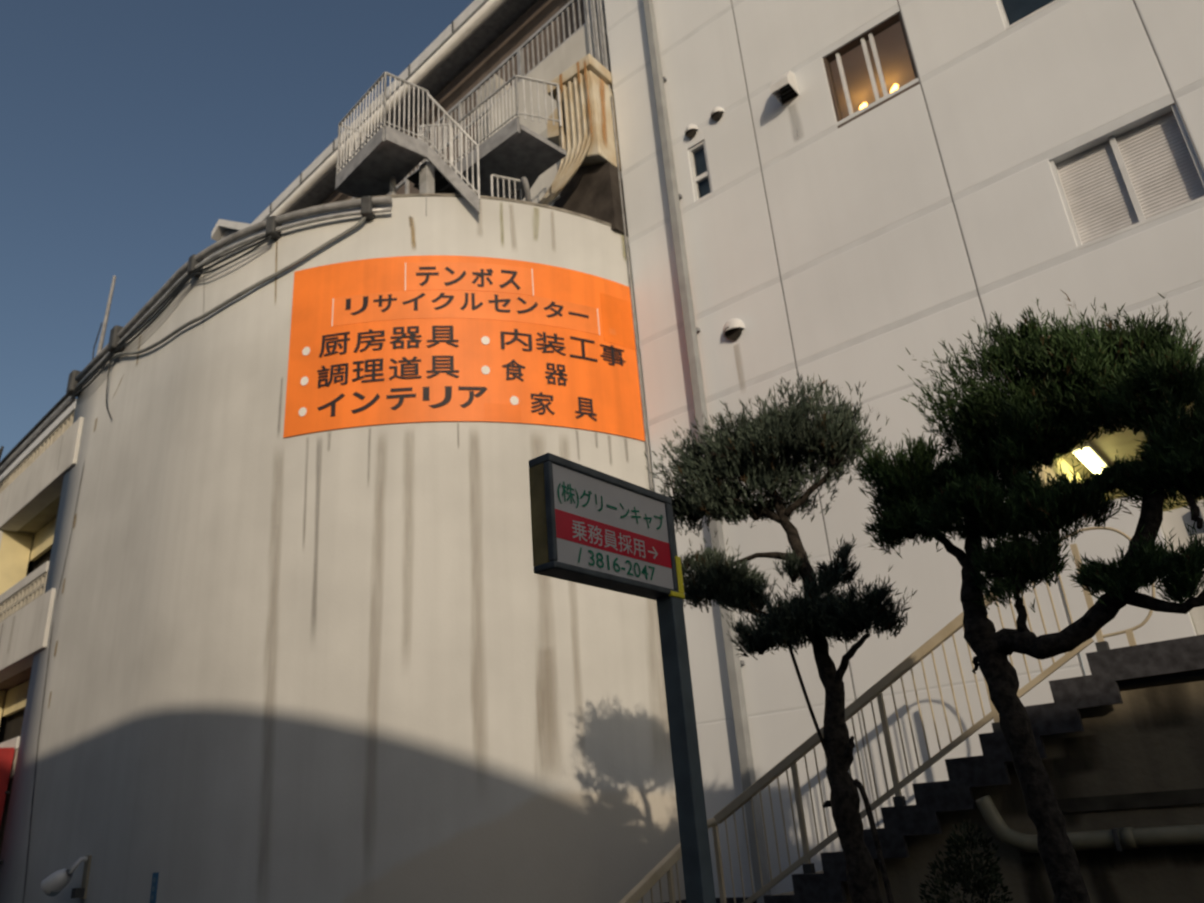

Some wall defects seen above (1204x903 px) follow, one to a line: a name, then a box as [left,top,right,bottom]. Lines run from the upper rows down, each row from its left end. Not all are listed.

rust [577,62,606,141]